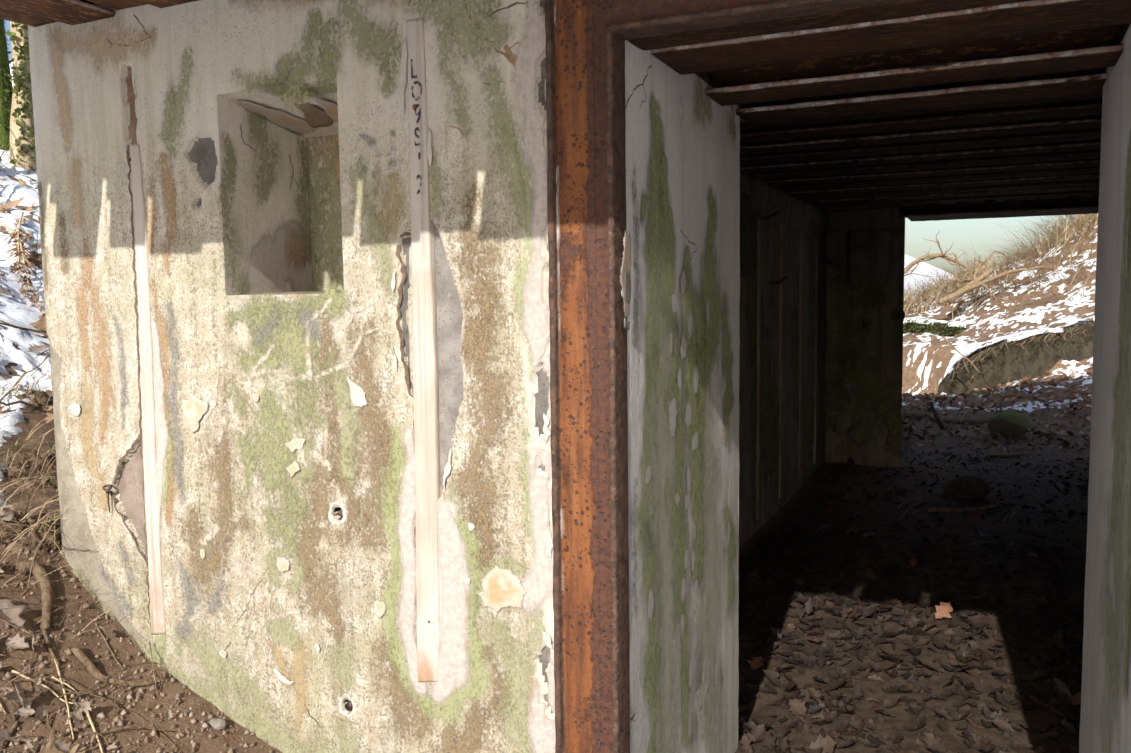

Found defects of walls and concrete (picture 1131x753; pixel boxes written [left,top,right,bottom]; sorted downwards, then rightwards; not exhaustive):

rust [38,183,48,286]
rust [49,29,155,512]
flaking render [50,343,166,668]
rust [147,154,177,273]
flaking render [188,137,221,185]
leakage [219,112,358,492]
flaking render [391,237,414,395]
flaking render [434,224,464,494]
leakage [398,427,562,753]
leakage [514,0,559,371]
flaking render [534,363,551,442]
leakage [632,96,736,753]